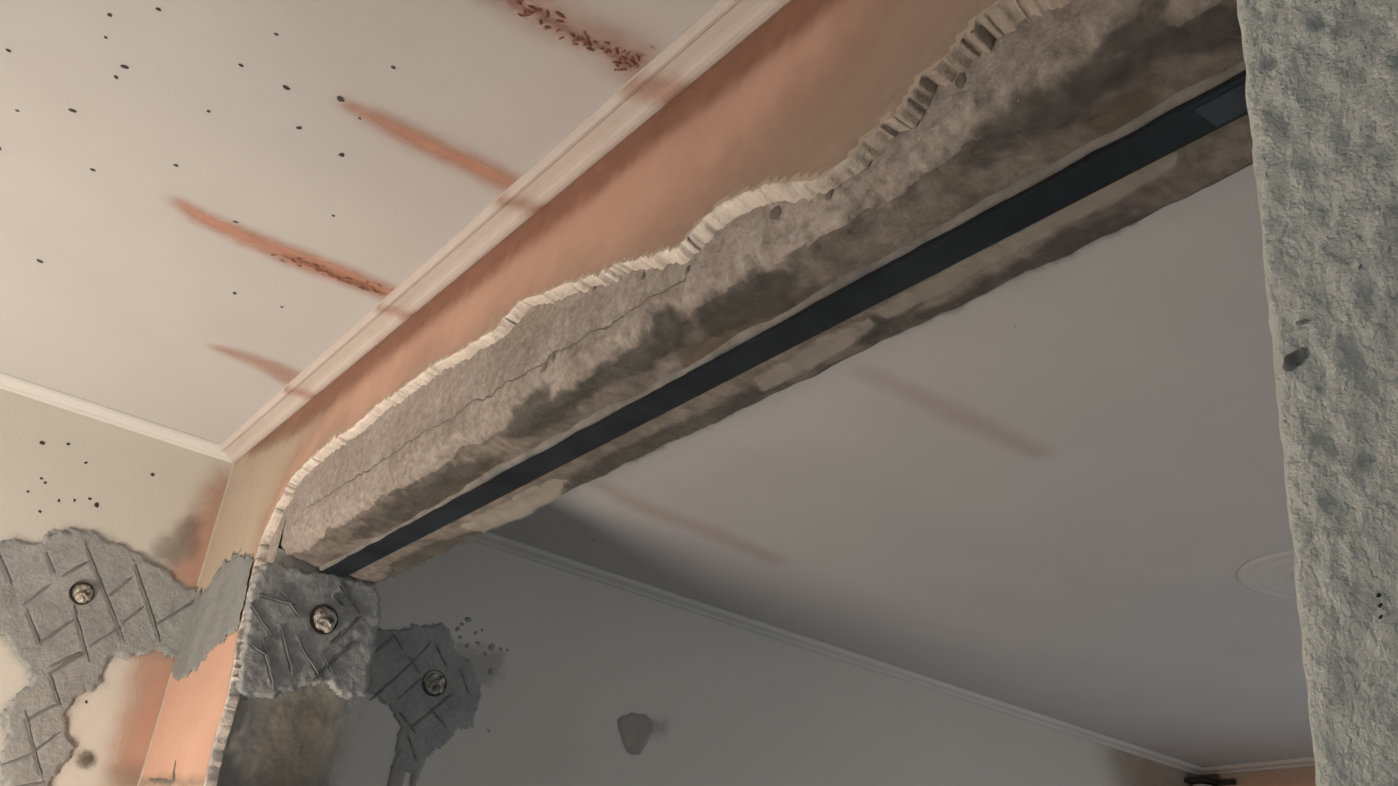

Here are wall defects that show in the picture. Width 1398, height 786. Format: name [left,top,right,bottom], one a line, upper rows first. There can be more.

corrosion [183,205,393,297]
crack [301,279,685,512]
corrosion [251,0,828,450]
water stain [263,0,982,532]
spalling [204,0,1246,786]